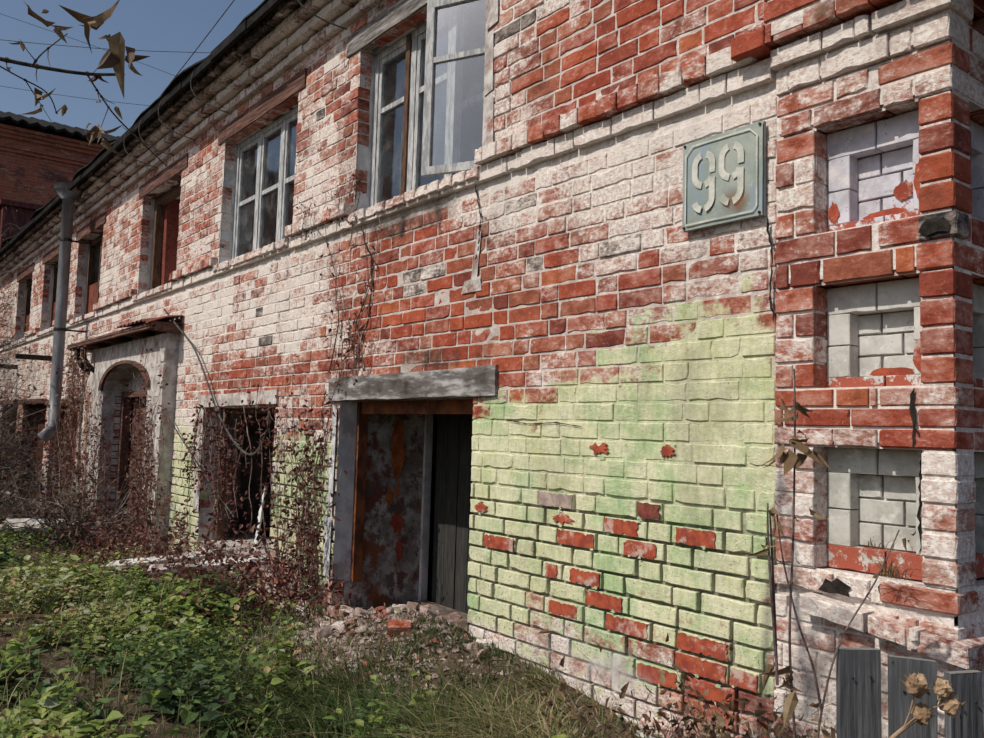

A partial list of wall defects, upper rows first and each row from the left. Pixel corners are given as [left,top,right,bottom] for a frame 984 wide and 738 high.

crack [766,215,778,323]
crack [909,388,922,554]
peeling [545,562,557,579]
peeling [548,568,648,639]
peeling [538,492,660,560]
peeling [676,527,716,550]
hole [818,578,851,597]
spalling [203,607,545,737]
peeling [636,632,758,705]